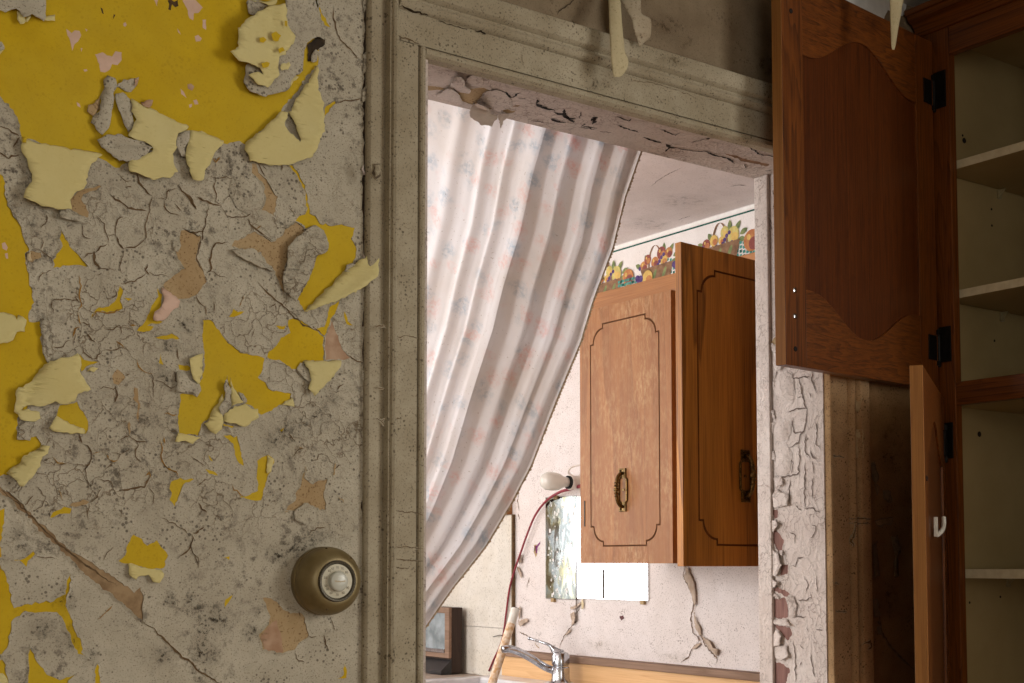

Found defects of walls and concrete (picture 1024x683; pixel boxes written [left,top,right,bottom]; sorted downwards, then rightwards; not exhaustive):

crack [0,126,20,160]
peeling [428,75,522,128]
crack [501,90,774,232]
peeling [0,0,382,509]
peeling [0,507,104,683]
peeling [116,532,171,583]
crack [0,144,323,683]
peeling [256,594,309,656]
crack [288,433,344,504]
crack [681,566,719,666]
peeling [772,476,797,683]
crack [774,371,847,682]